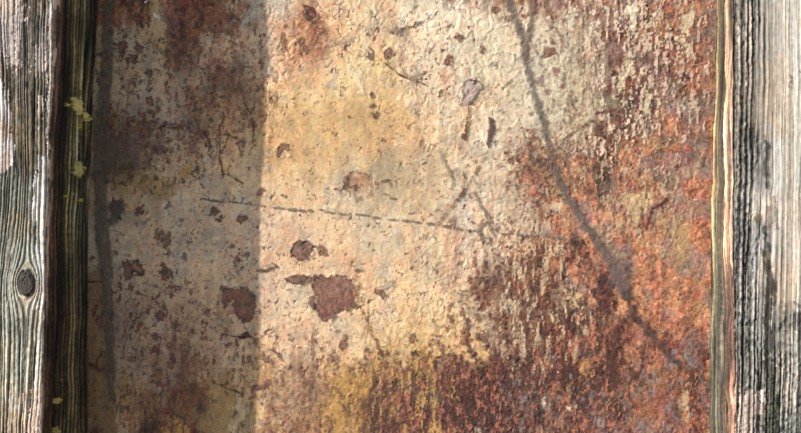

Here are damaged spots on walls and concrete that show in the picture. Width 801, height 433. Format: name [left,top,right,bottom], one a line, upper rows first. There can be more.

corrosion [91,0,717,433]
peeling [459,79,484,105]